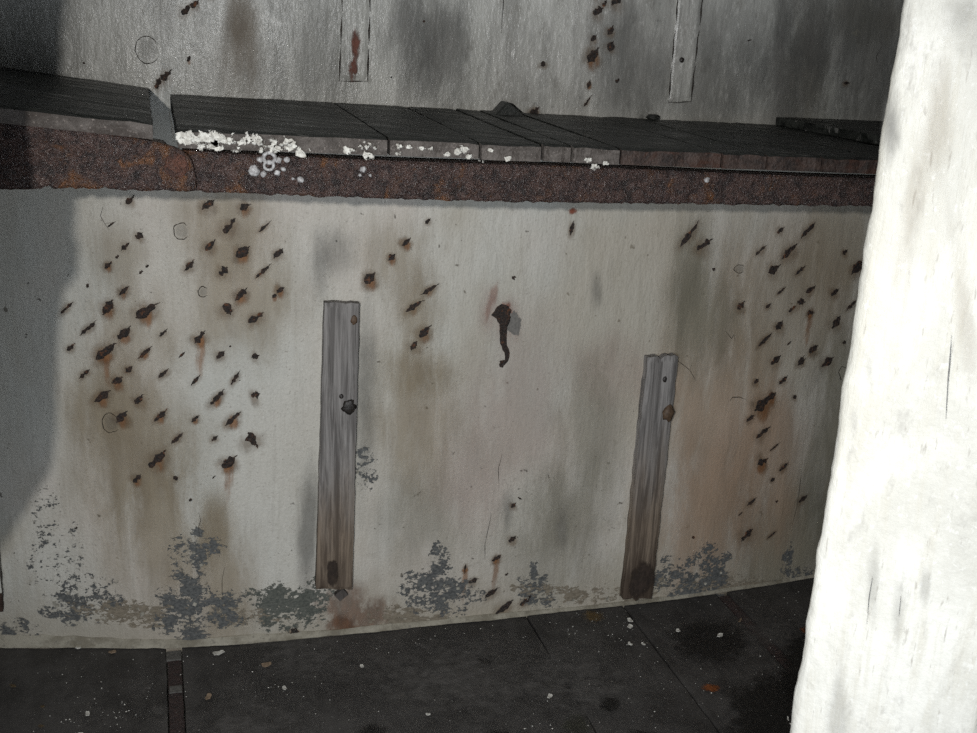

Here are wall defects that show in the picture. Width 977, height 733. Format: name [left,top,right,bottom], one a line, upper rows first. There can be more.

rust [349,31,360,80]
damp [168,105,311,183]
peeling [26,485,336,640]
peeling [367,540,635,625]
peeling [652,536,814,598]
peeling [0,618,39,636]
damp [730,636,805,733]